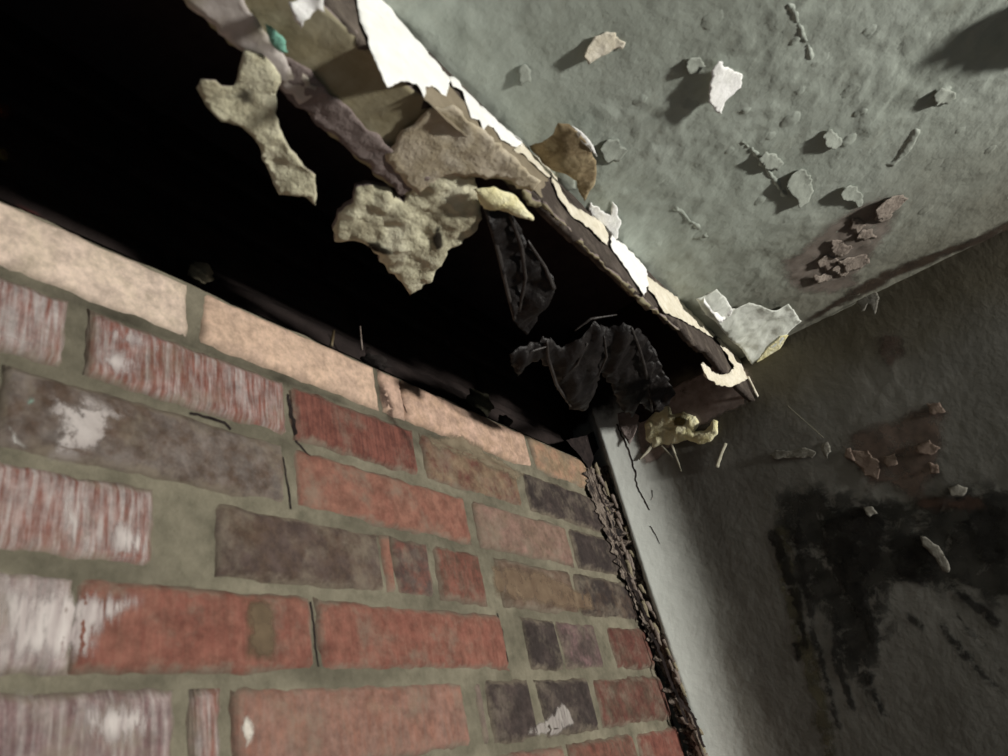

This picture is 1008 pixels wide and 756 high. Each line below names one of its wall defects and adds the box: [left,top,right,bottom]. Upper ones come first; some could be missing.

peeling [265,23,288,53]
peeling [196,49,317,205]
flaking render [357,0,759,428]
flaking render [635,403,671,463]
crack [310,602,319,667]
crack [583,424,708,756]
leakage [768,486,1008,756]